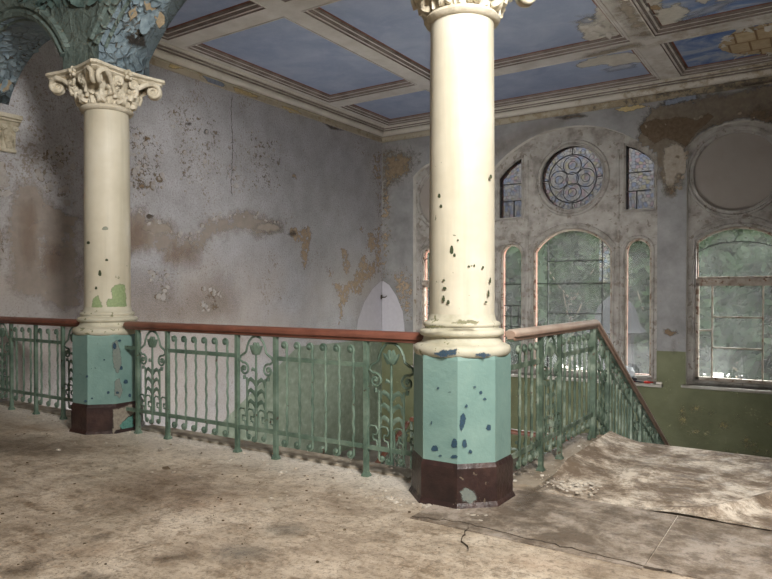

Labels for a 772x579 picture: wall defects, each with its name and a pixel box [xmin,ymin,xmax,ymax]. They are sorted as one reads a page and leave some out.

peeling [576,0,727,71]
flaking render [718,23,772,59]
peeling [0,44,41,92]
peeling [129,103,221,196]
flaking render [615,80,772,196]
flaking render [130,208,280,257]
peeling [92,284,127,307]
peeling [434,349,457,357]
peeling [431,404,472,458]
peeling [460,488,476,503]